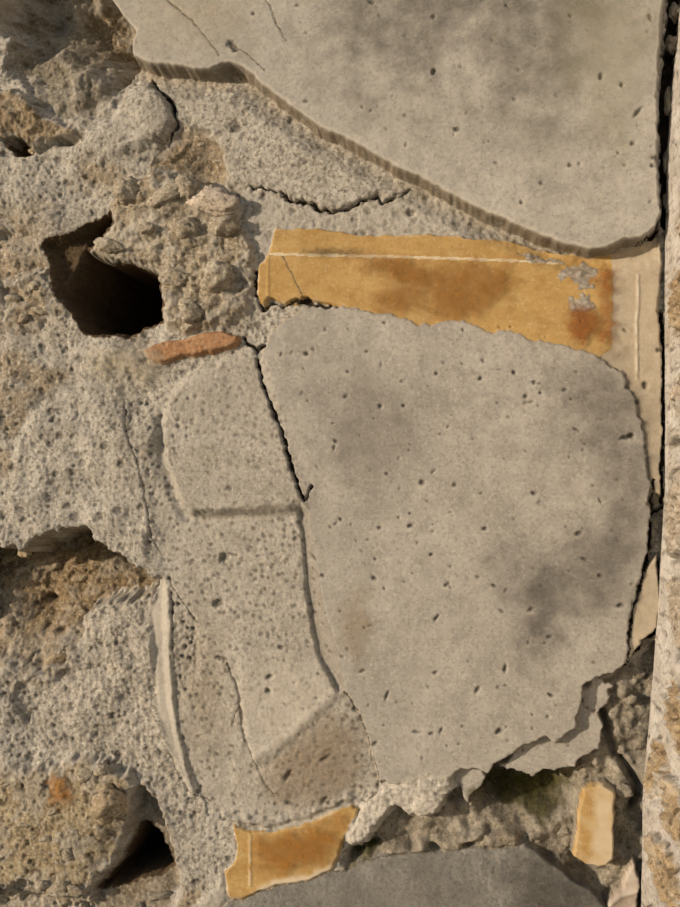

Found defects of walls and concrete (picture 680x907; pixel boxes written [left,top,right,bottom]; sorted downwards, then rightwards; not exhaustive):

crack [154,83,180,145]
crack [251,187,413,215]
crack [244,338,314,503]
flaking render [0,526,160,696]
flaking render [0,751,184,907]
crack [227,659,275,797]
flaking render [340,640,655,907]